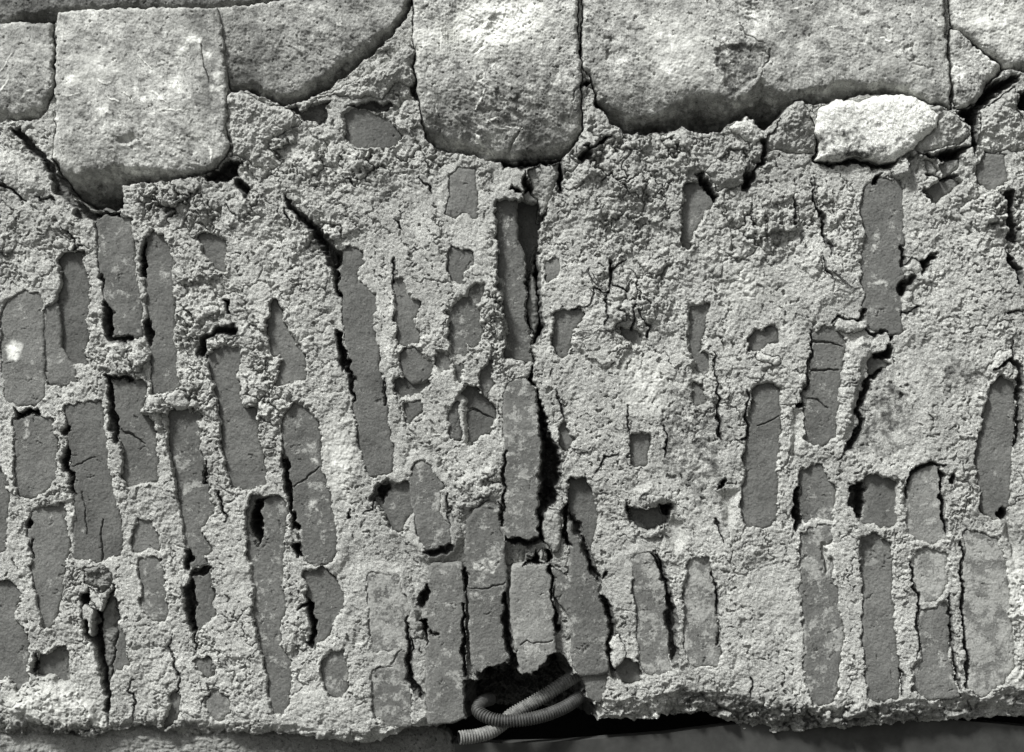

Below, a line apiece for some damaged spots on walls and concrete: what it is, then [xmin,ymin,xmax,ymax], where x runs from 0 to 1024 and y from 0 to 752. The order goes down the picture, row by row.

crack [496,131,564,224]
crack [283,195,343,298]
spalling [98,275,155,347]
spalling [195,300,238,359]
crack [336,330,357,403]
crack [803,309,888,461]
crack [520,249,616,672]
spalling [847,481,866,519]
spalling [80,585,119,727]
spalling [183,549,212,639]
spalling [461,592,598,719]
crack [651,553,681,663]